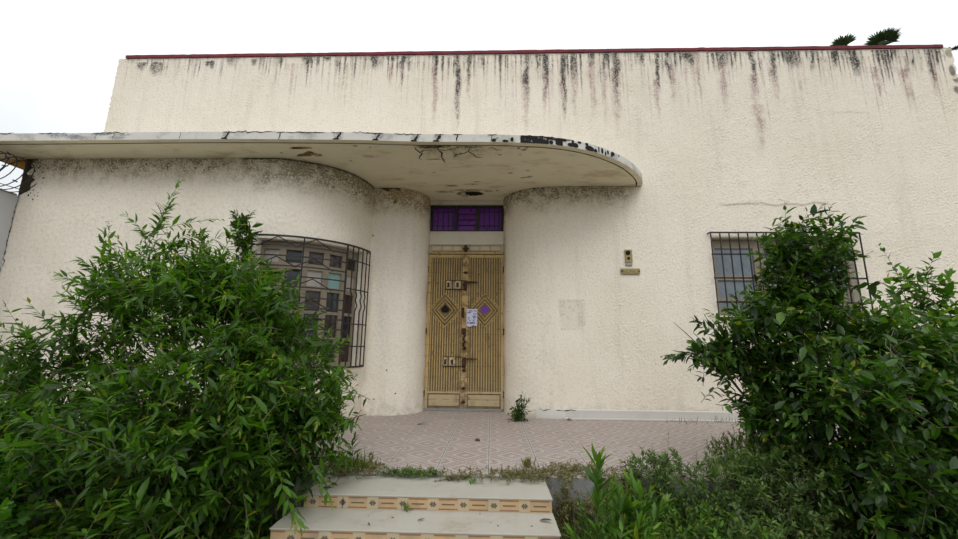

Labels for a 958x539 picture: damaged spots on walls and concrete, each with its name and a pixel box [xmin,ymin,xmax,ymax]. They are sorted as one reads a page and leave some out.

damp [304,56,418,78]
damp [434,54,548,105]
damp [561,53,620,97]
damp [655,52,694,86]
damp [706,50,859,73]
damp [872,50,914,82]
crack [411,134,499,163]
peeling [492,135,619,157]
damp [18,158,228,200]
damp [243,158,430,212]
damp [440,184,624,207]